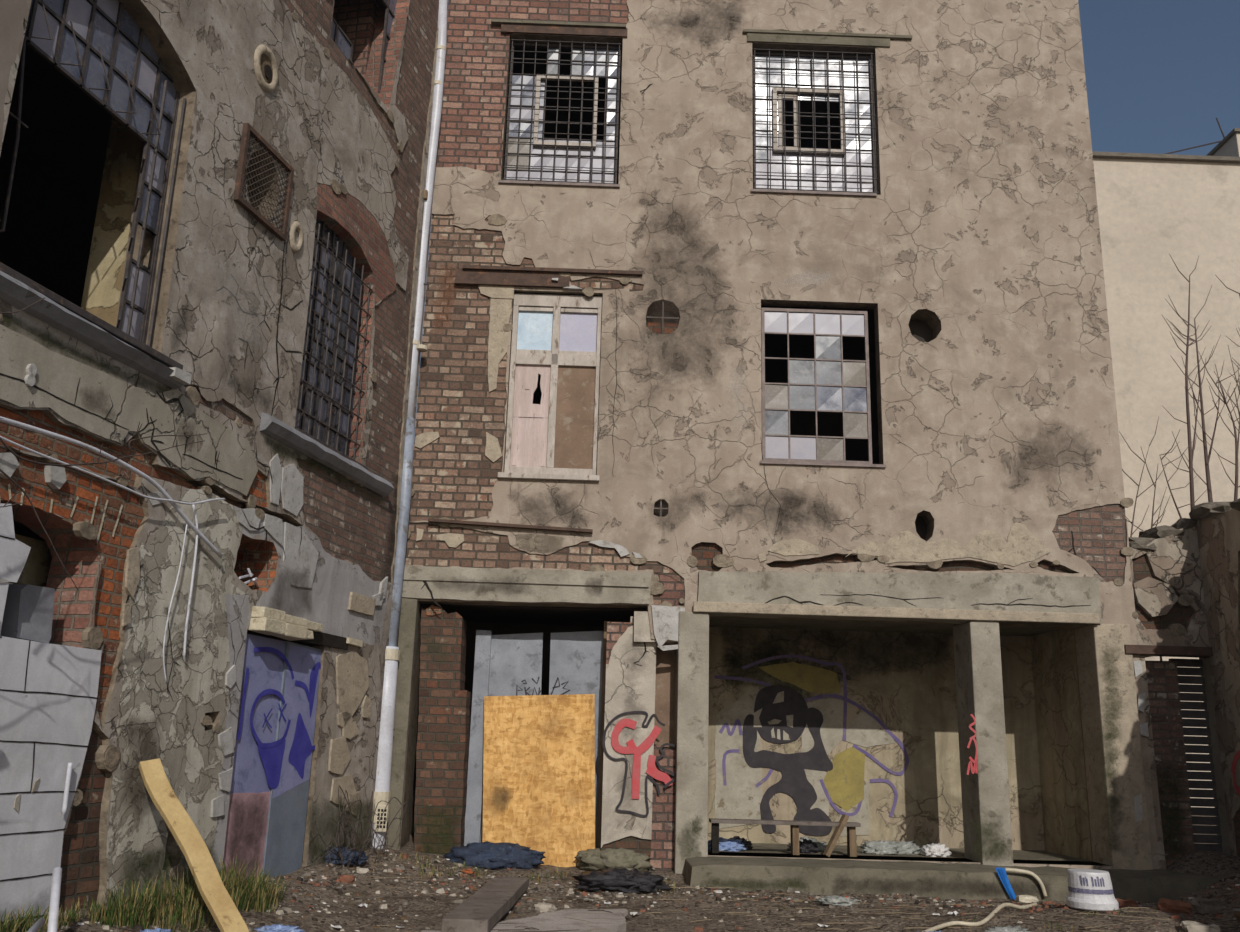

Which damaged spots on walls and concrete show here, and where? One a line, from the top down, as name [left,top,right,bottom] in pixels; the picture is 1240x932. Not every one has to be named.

crack [216,242,303,416]
crack [0,373,273,483]
flaking render [0,0,734,913]
crack [612,290,625,477]
crack [759,441,781,532]
crack [243,512,302,559]
peeling [758,498,1162,586]
crack [167,611,180,700]
flaking render [1132,593,1194,636]